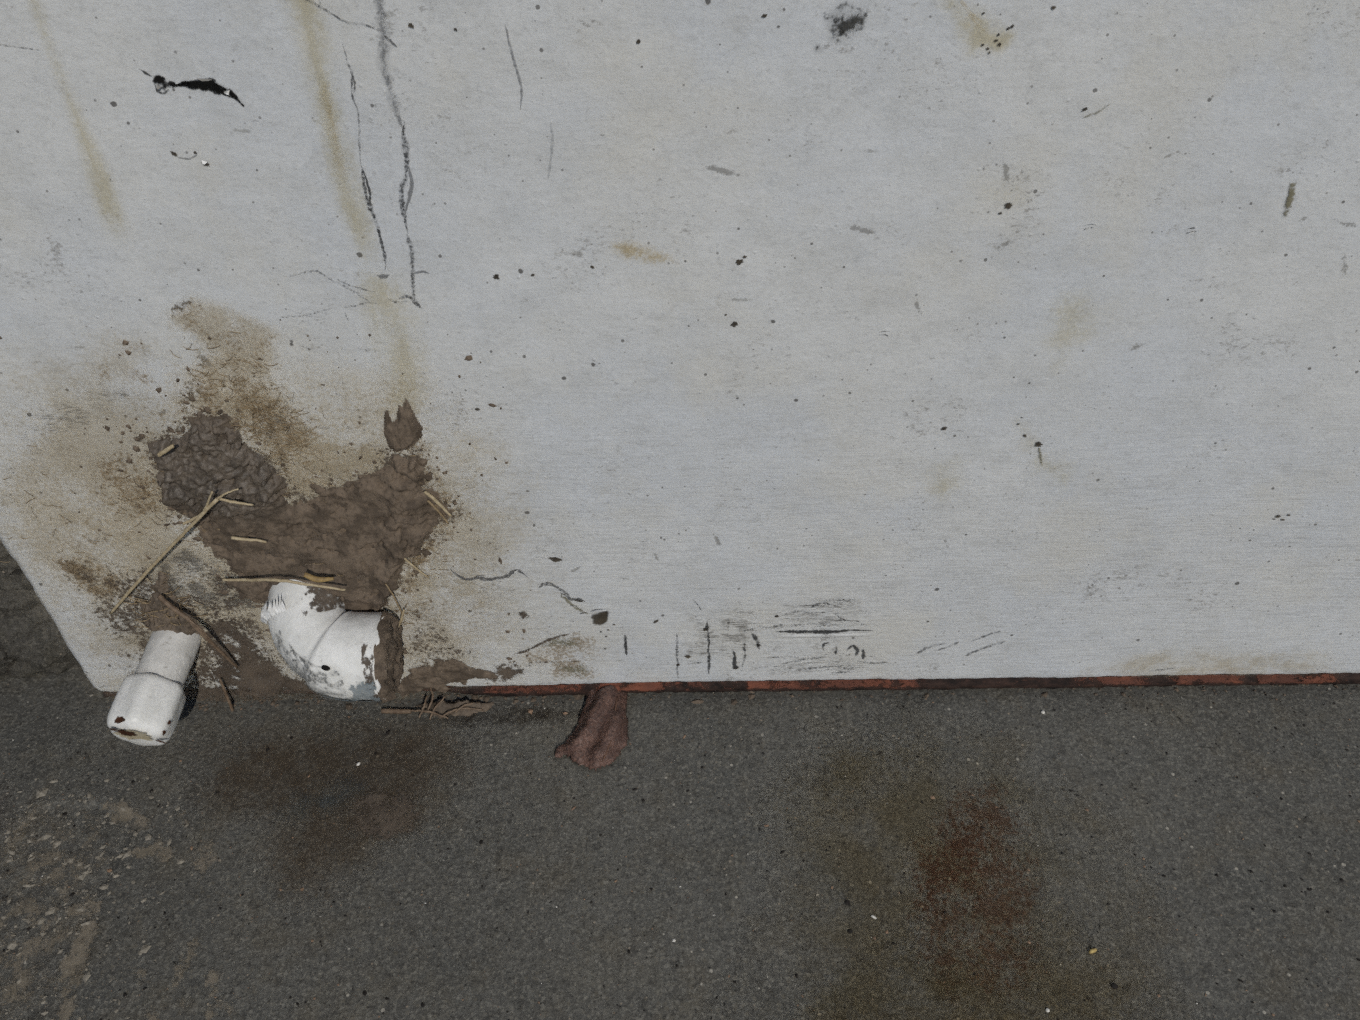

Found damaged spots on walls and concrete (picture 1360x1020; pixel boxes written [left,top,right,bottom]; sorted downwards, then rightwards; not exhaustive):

rust [484,682,704,694]
rust [747,679,919,690]
rust [1075,676,1149,686]
rust [1173,673,1336,685]